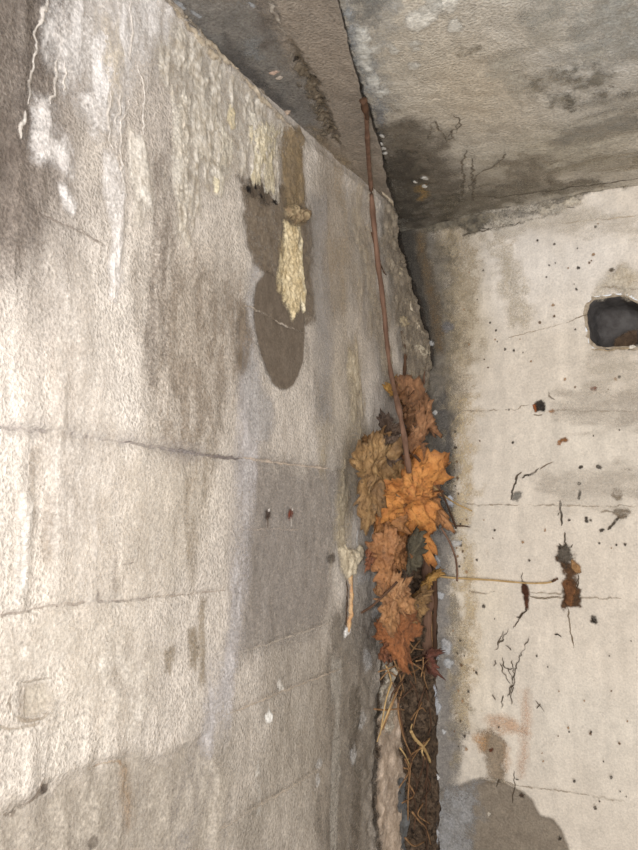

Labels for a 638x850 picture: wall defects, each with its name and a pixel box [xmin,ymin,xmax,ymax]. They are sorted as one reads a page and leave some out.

crack [428,116,506,200]
spalling [373,192,433,400]
spalling [587,265,638,351]
water stain [0,0,366,850]
crack [70,432,329,469]
water stain [344,0,638,850]
crack [465,462,552,506]